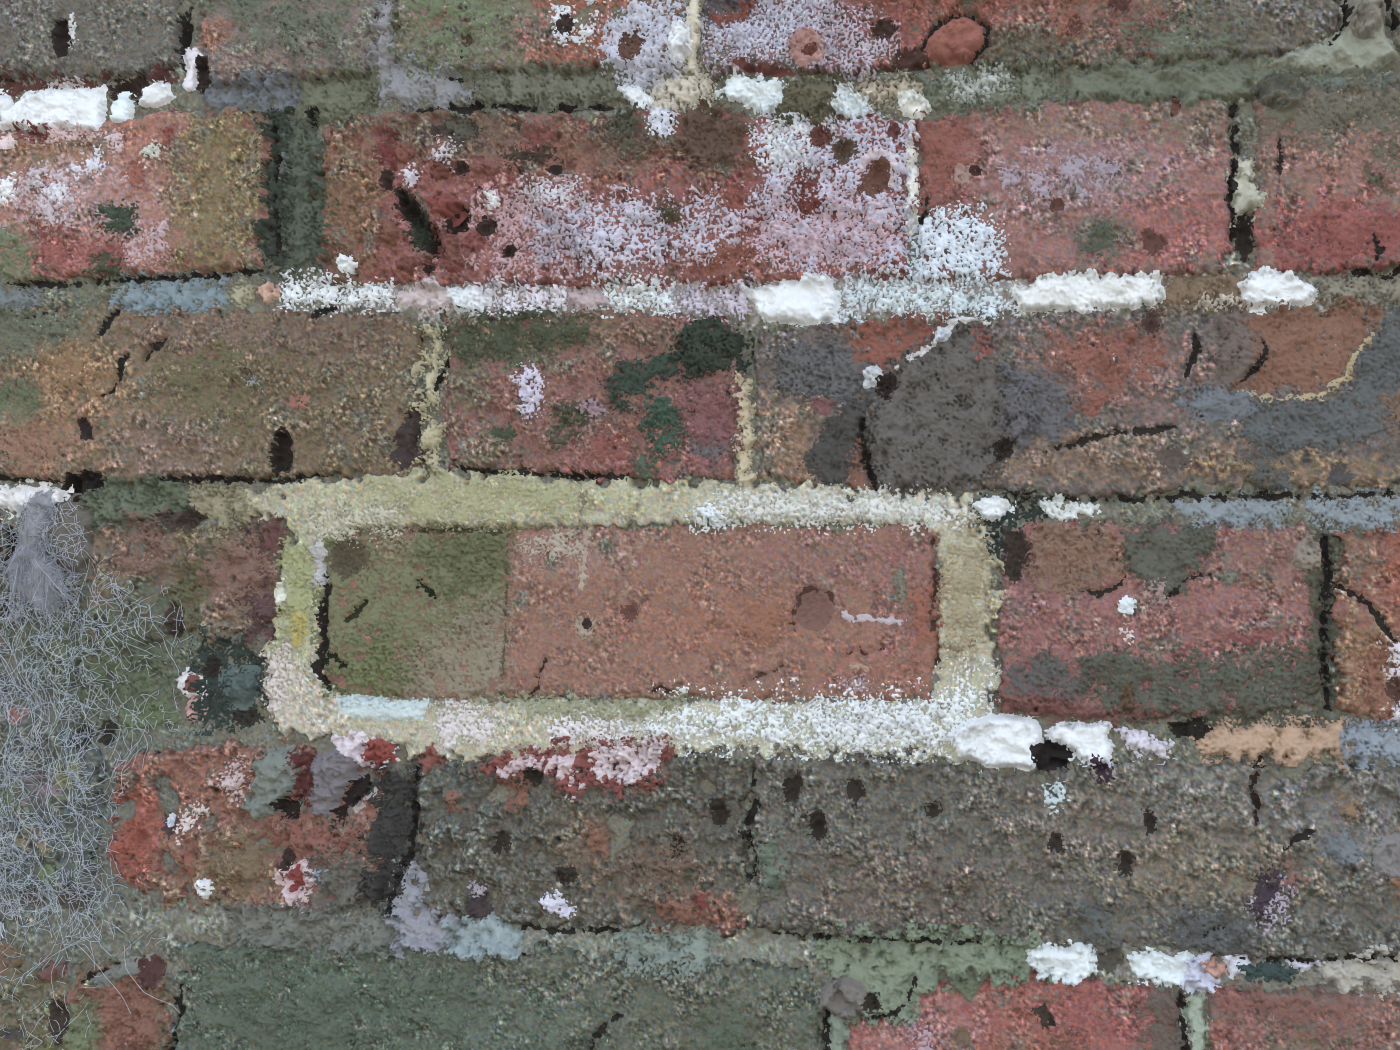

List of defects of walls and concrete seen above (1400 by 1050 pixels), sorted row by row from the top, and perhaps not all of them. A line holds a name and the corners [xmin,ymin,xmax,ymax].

damp [251,0,1166,488]
efflorescence [1376,634,1400,680]
efflorescence [1378,700,1400,733]